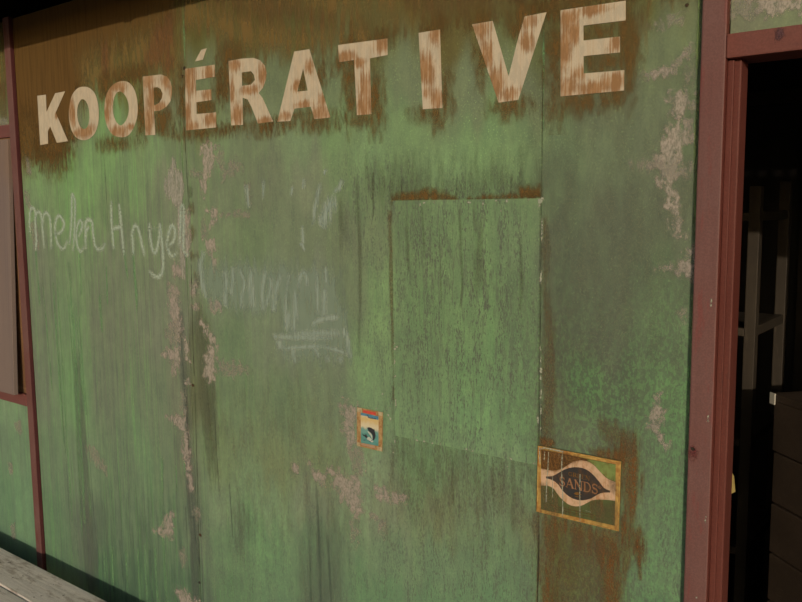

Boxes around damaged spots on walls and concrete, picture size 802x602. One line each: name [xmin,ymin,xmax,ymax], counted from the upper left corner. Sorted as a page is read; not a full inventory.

corrosion [2,0,186,171]
corrosion [197,44,241,114]
corrosion [242,71,255,85]
corrosion [336,59,382,126]
corrosion [512,0,625,115]
peeling [193,140,223,199]
peeling [637,75,696,238]
peeling [163,157,200,375]
peeling [199,320,246,384]
peeling [165,394,194,491]
peeling [309,397,385,543]
corrosion [537,437,643,602]